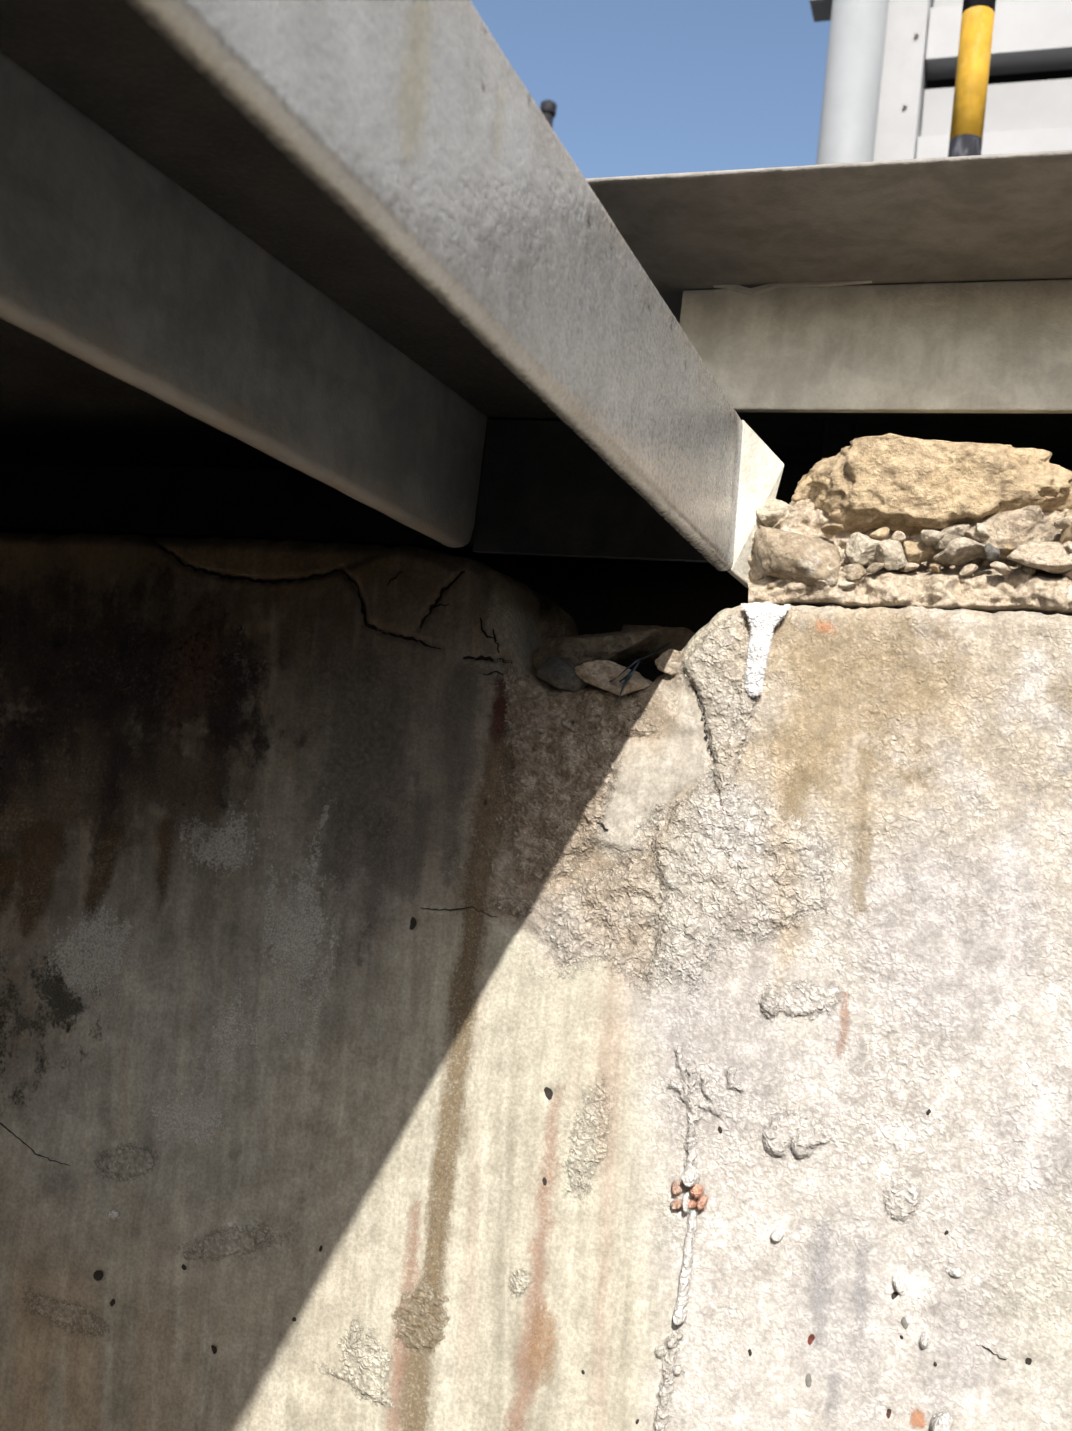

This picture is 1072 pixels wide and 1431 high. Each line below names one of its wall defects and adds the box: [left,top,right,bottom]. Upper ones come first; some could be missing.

crack [148,538,513,676]
spalling [776,465,814,504]
peeling [815,563,941,590]
peeling [869,527,944,546]
peeling [975,523,990,537]
peeling [959,544,1036,577]
crack [684,671,713,758]
peeling [453,555,839,1007]
water stain [0,564,343,1146]
water stain [401,680,509,1308]
rust [508,1097,558,1431]
water stain [389,1328,432,1431]